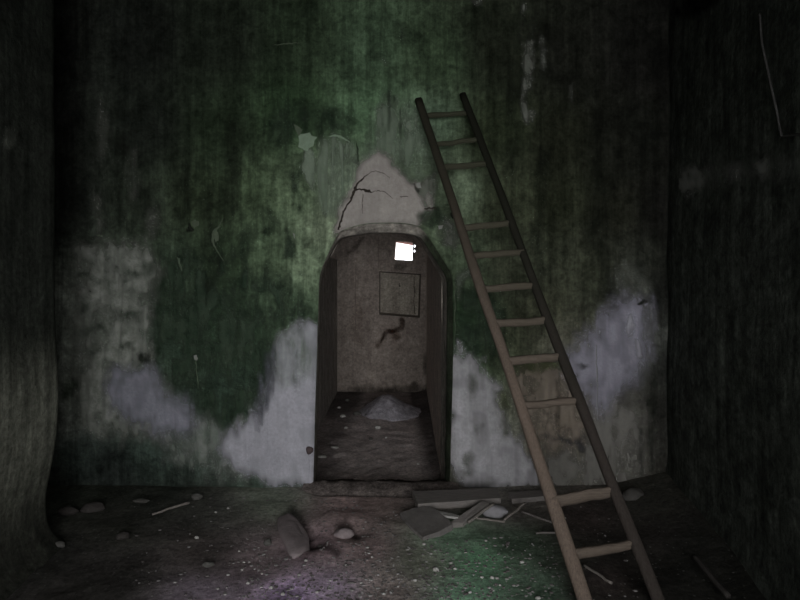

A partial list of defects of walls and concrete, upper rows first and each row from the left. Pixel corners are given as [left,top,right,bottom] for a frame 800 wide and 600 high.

crack [338,143,408,230]
flaking render [335,152,437,233]